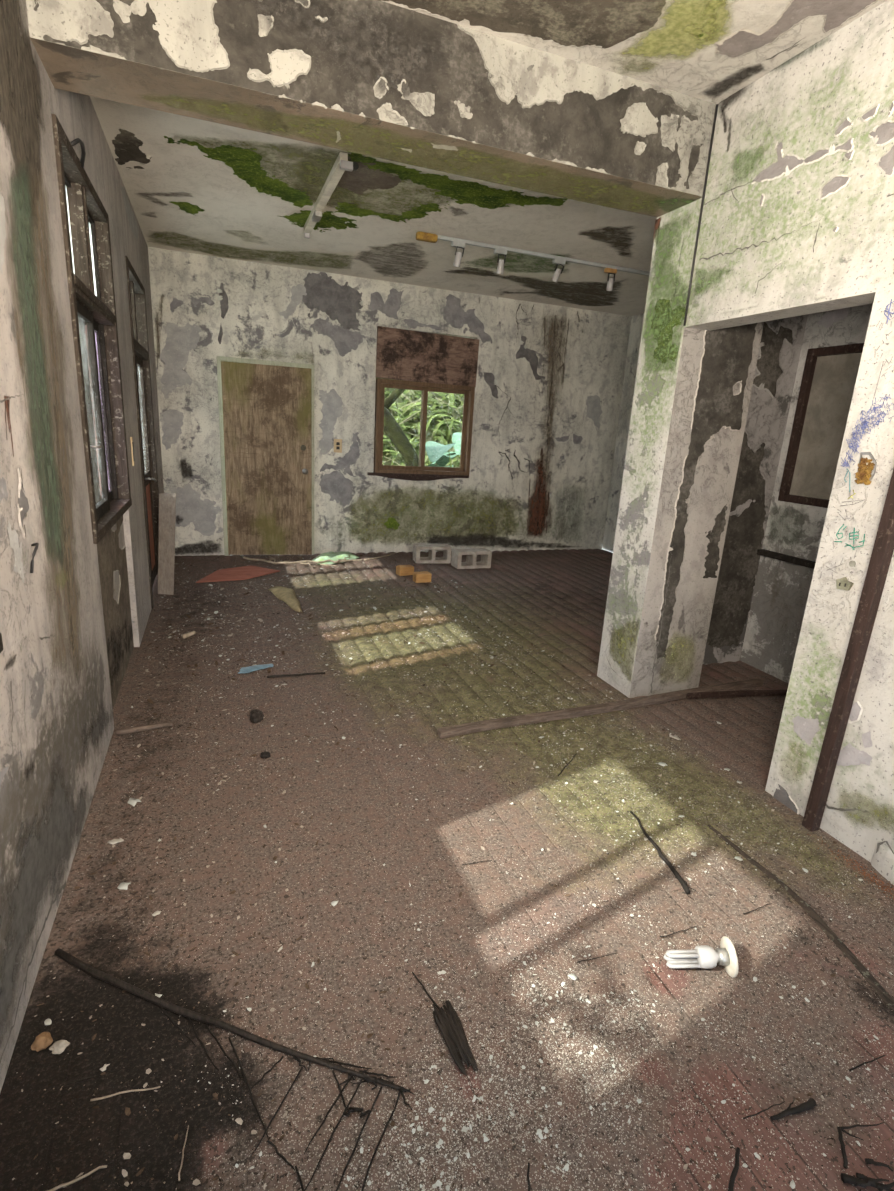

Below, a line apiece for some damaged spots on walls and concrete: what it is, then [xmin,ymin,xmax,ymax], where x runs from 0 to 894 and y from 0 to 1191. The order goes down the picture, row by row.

water stain [253,0,442,94]
peeling [43,0,703,190]
water stain [379,0,668,50]
water stain [704,65,763,148]
peeling [714,0,878,59]
peeling [752,101,894,207]
water stain [151,232,424,277]
water stain [0,0,81,676]
peeling [159,283,229,450]
peeling [280,272,493,357]
water stain [446,267,621,490]
peeling [319,389,360,506]